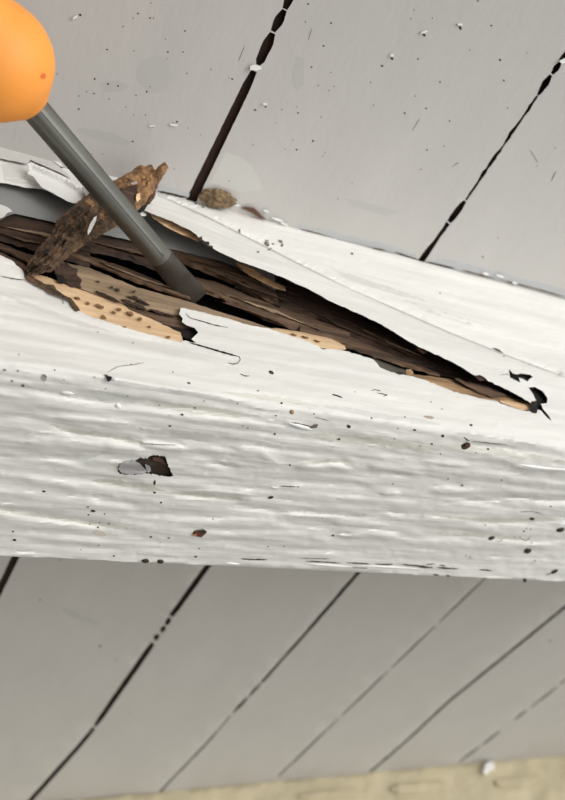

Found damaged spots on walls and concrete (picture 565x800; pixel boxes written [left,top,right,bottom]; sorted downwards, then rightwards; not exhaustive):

spalling [0,147,531,411]
crack [189,342,246,377]
peeling [118,455,173,477]